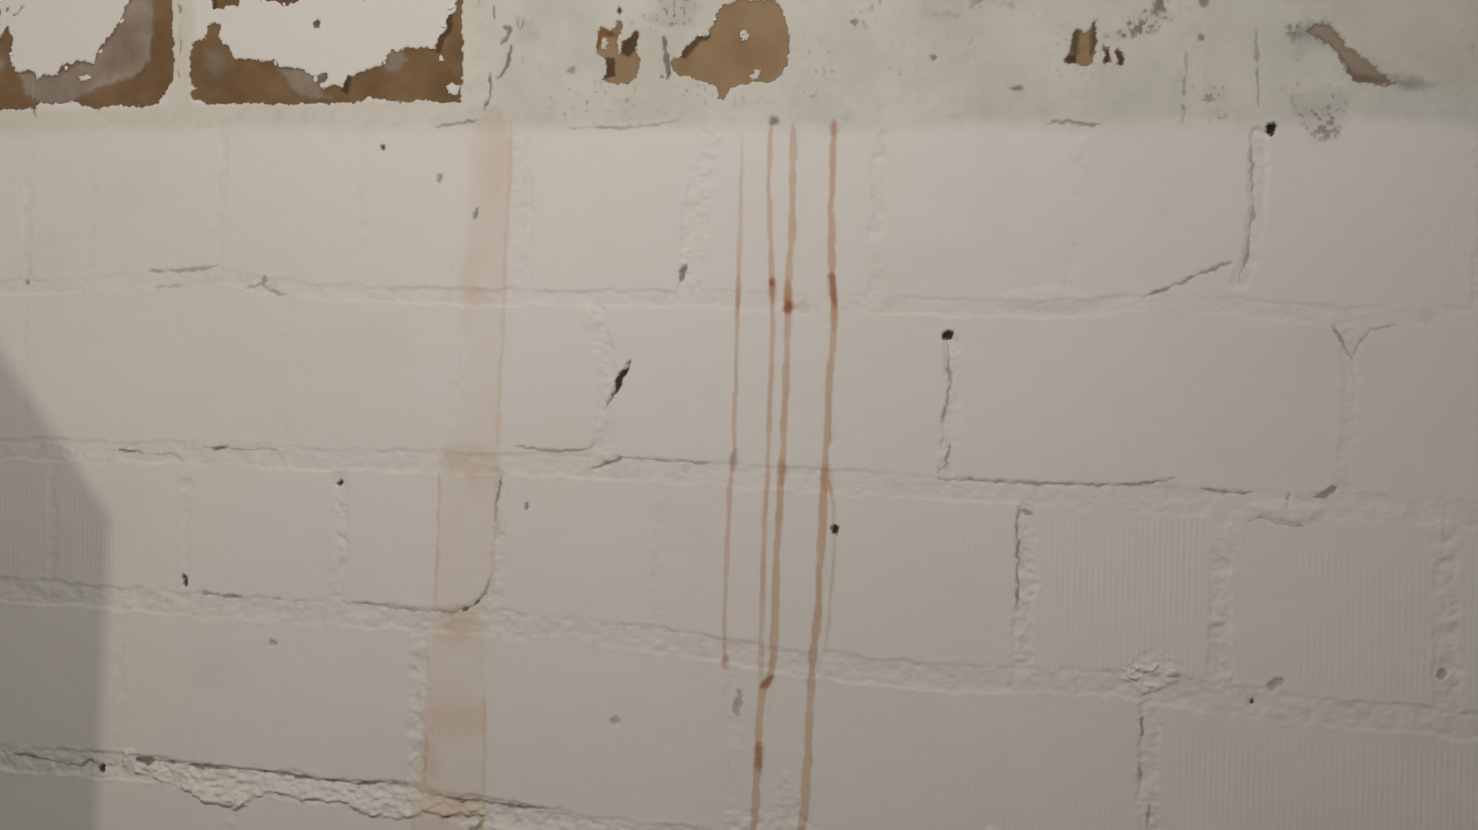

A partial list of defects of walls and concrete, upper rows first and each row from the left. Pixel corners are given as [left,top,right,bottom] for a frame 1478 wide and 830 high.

peeling [0,0,464,110]
peeling [596,21,640,85]
peeling [670,0,790,100]
peeling [1064,22,1124,66]
peeling [1307,24,1392,86]
crack [137,757,224,769]
crack [264,770,398,784]